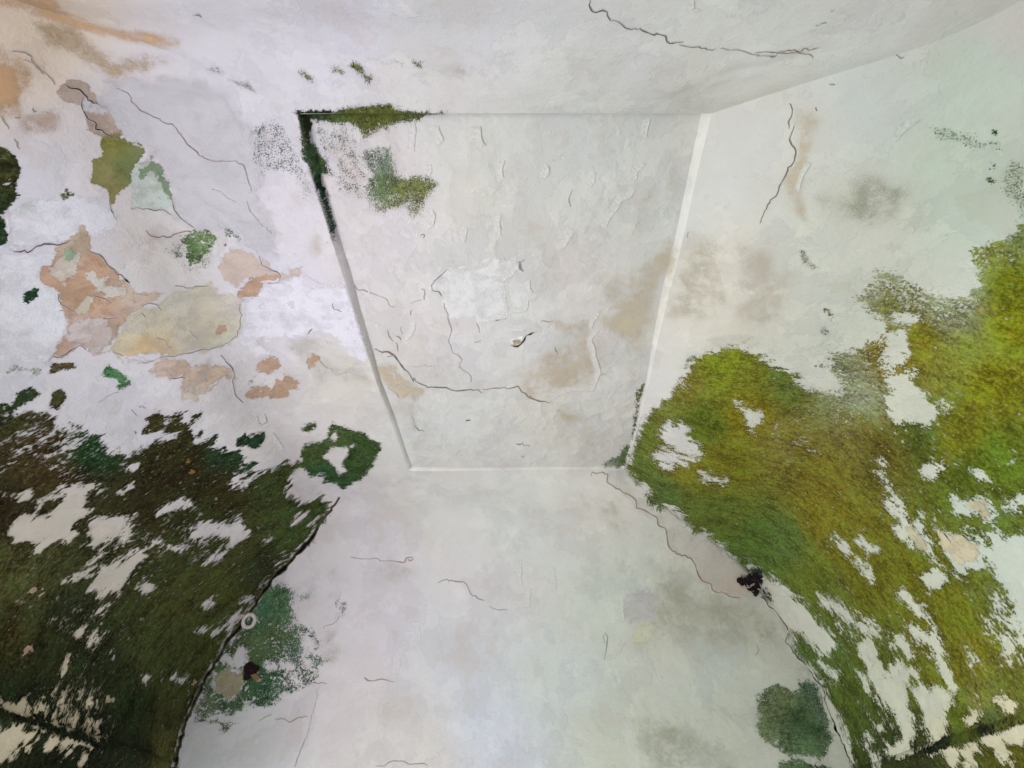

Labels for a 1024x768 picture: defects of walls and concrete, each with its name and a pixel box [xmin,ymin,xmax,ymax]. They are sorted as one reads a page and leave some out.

crack [588,0,835,58]
peeling [56,79,174,210]
crack [12,50,272,238]
crack [760,103,817,223]
peeling [6,212,303,403]
crack [354,269,551,432]
leakage [514,226,802,426]
crack [174,497,340,768]
crack [350,556,414,564]
crack [437,579,508,611]